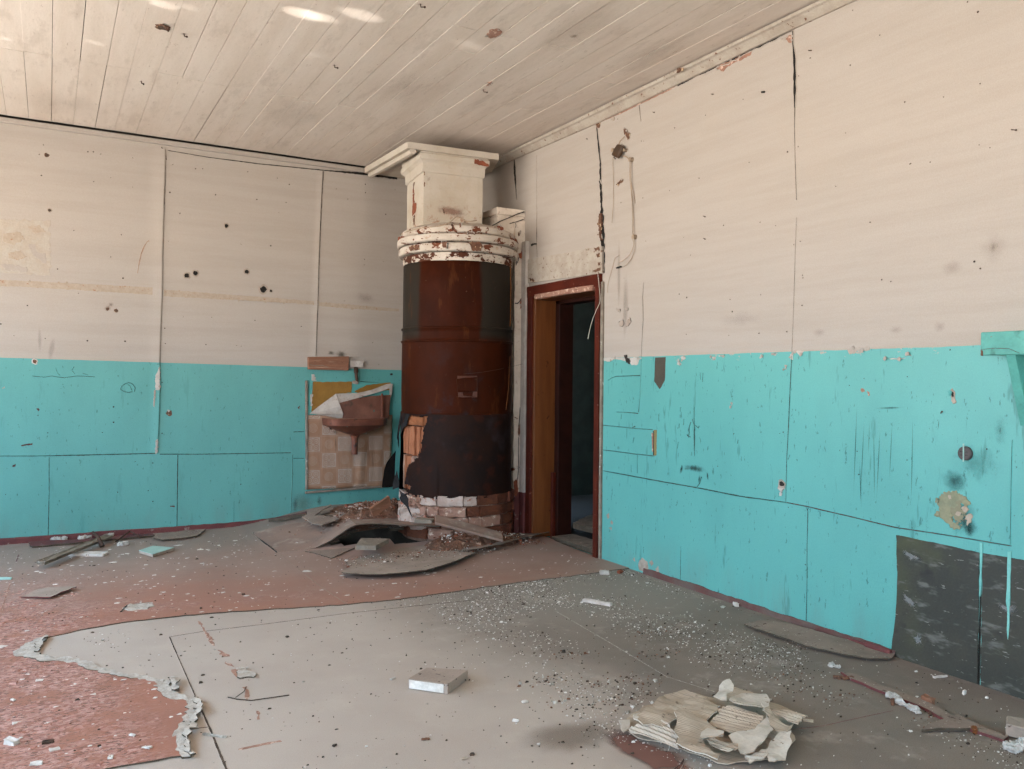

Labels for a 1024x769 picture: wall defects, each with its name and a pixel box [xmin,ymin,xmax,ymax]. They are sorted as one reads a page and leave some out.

peeling [441,222,483,251]
crack [596,127,606,273]
crack [603,30,1013,685]
peeling [934,491,973,530]